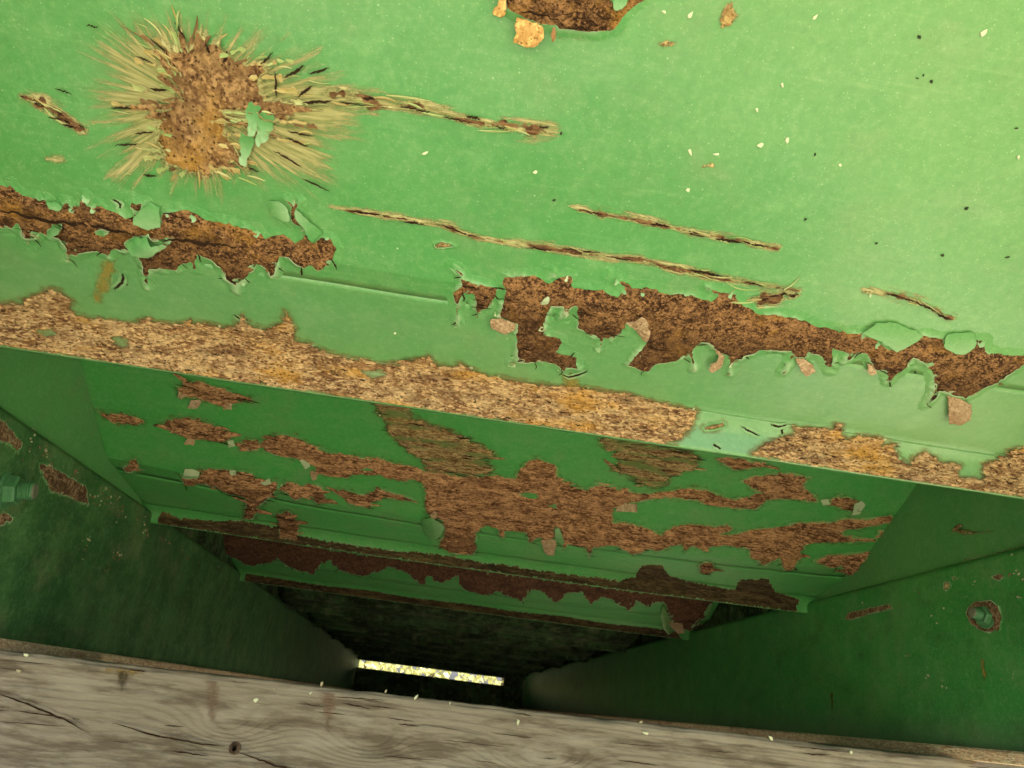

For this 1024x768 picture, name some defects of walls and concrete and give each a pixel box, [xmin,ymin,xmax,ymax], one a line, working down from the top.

peeling [134,31,195,93]
peeling [220,47,246,58]
peeling [249,58,309,105]
crack [259,51,560,141]
peeling [493,0,652,48]
peeling [143,102,318,180]
crack [242,130,800,308]
crack [861,287,955,320]
peeling [374,403,506,478]
rust [0,239,1024,639]
peeling [599,438,707,488]